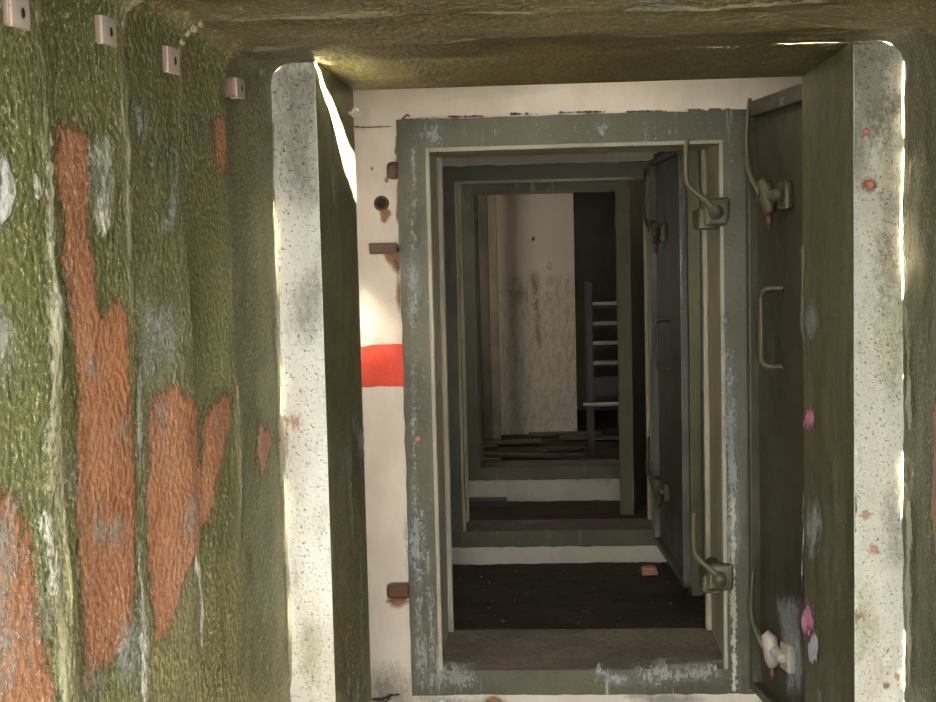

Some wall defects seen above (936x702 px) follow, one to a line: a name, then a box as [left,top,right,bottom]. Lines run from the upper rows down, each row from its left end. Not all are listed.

rust [384,247,401,307]